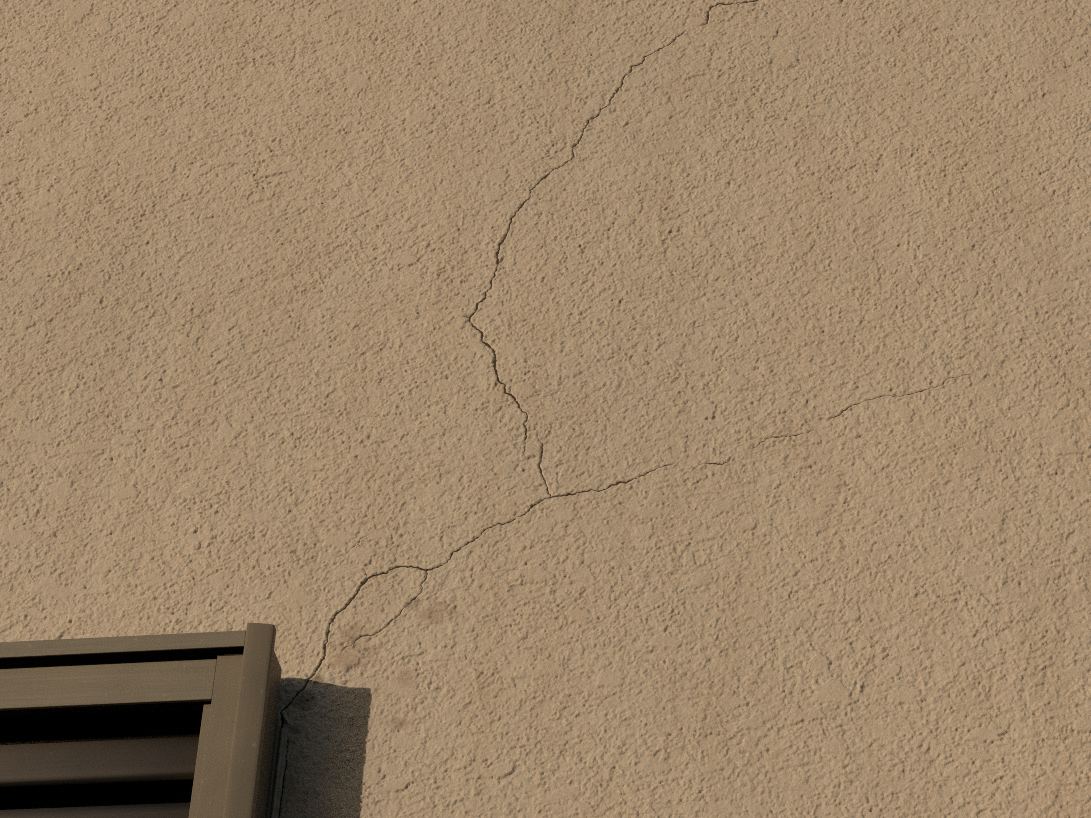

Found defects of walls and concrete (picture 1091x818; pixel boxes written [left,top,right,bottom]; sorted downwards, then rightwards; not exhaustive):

crack [278,0,758,818]